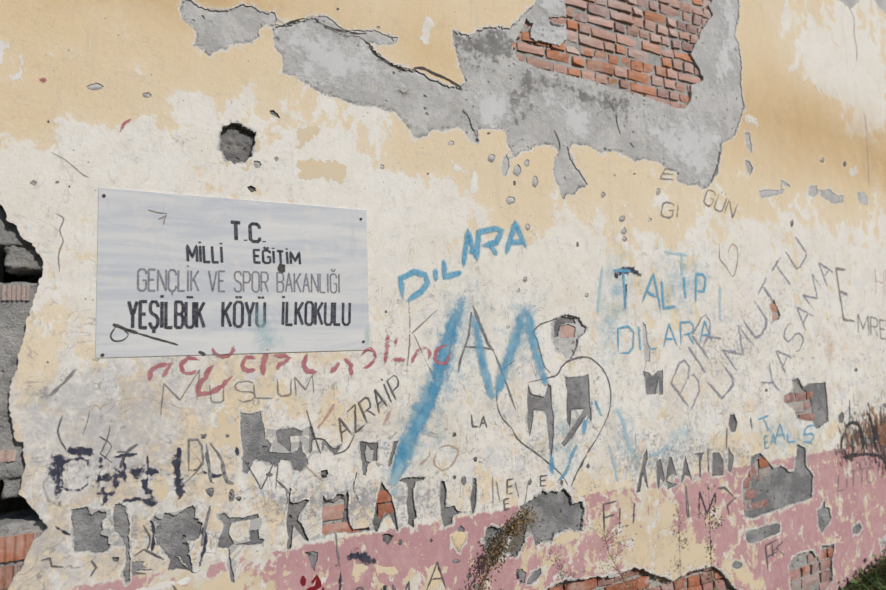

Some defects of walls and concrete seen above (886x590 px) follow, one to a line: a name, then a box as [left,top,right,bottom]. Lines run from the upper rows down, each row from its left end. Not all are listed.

crack [277,18,462,90]
flaking render [180,0,759,199]
flaking render [784,378,845,429]
flaking render [71,502,203,590]
peeling [198,571,246,590]
peeling [236,529,264,545]
flaking render [322,494,360,535]
flaking render [376,490,395,520]
flaking render [484,480,585,567]
flaking render [548,502,769,590]
flaking render [743,444,813,543]
flaking render [788,544,835,590]